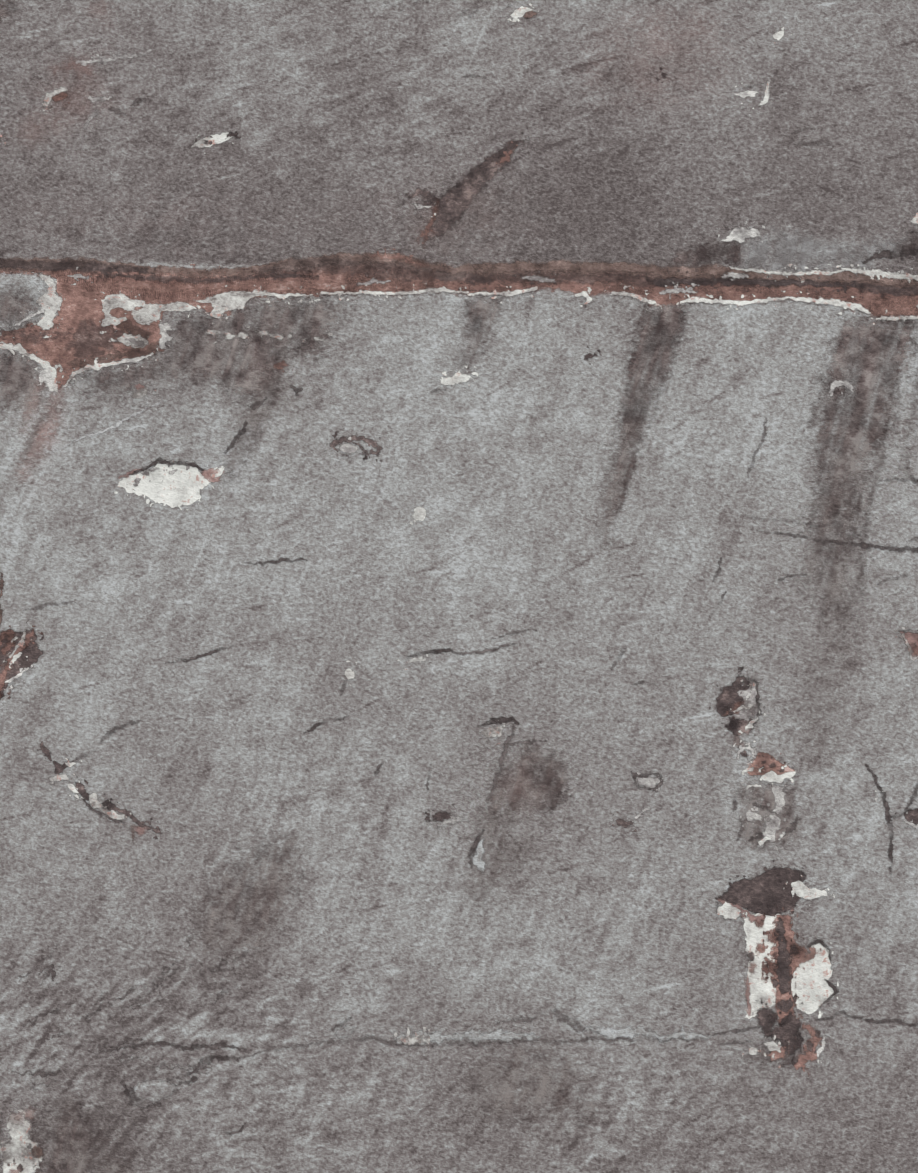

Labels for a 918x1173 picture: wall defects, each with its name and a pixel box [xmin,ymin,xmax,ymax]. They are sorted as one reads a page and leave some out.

peeling [0,264,556,393]
rust [0,248,918,321]
peeling [574,264,918,325]
spalling [114,458,225,511]
leakage [604,302,690,536]
leakage [813,316,916,560]
spalling [0,573,44,700]
crack [865,764,918,871]
spalling [709,667,839,1076]
crack [703,1026,760,1044]
crack [818,1010,915,1027]
peeling [0,1110,43,1173]